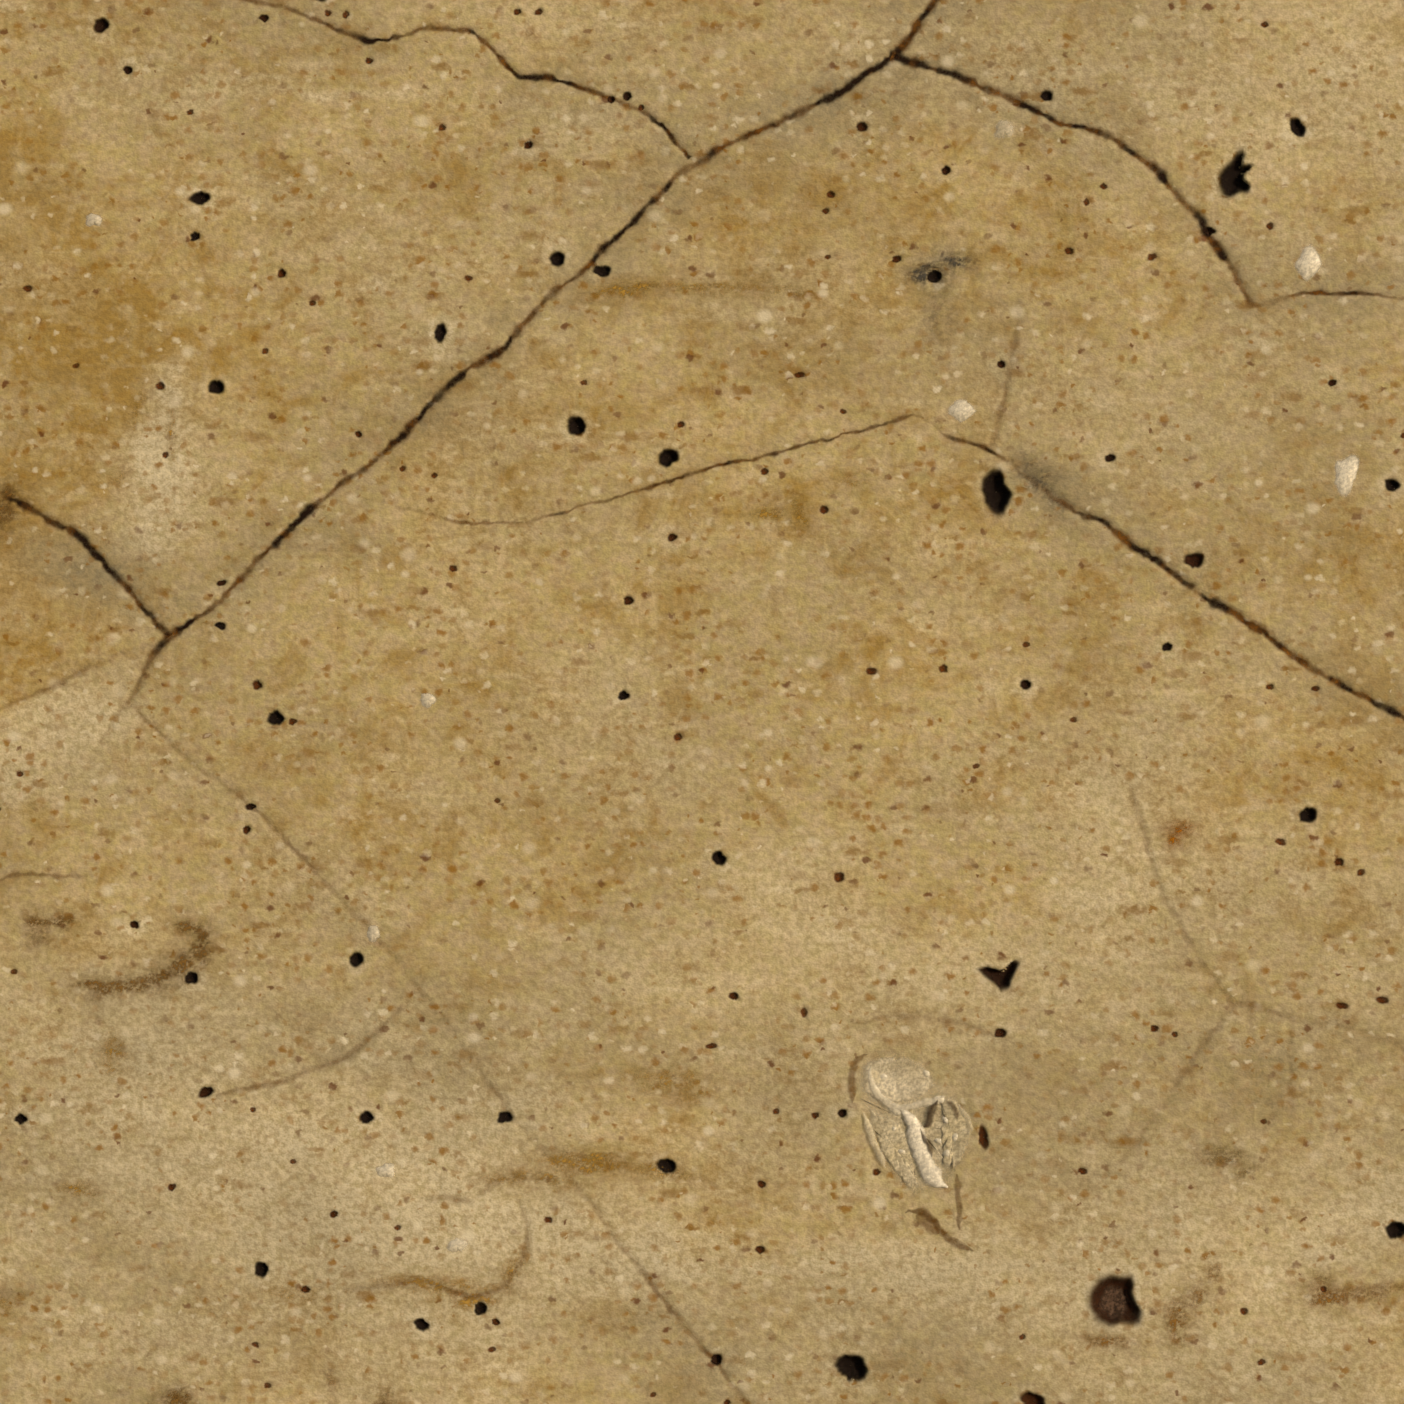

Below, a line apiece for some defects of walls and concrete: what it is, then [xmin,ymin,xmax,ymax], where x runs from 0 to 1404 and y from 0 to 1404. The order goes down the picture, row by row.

crack [8,0,1252,664]
crack [1300,289,1378,297]
crack [1061,500,1404,720]
spalling [863,1059,970,1188]